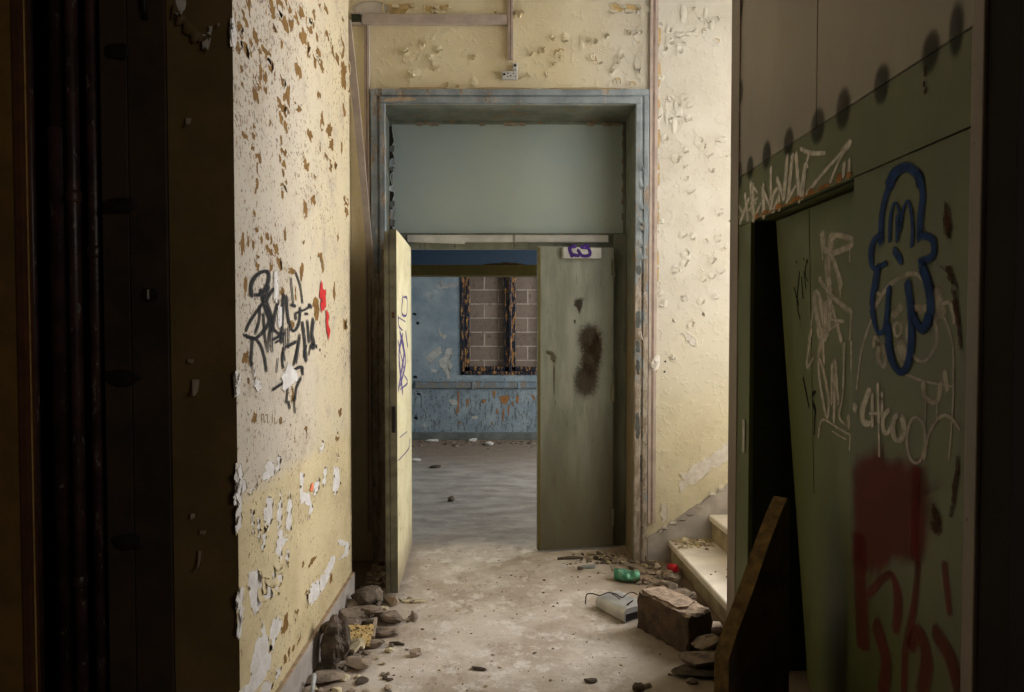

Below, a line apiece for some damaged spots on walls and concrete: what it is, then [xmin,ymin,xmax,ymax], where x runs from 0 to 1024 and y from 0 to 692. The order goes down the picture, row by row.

peeling [382,1,452,14]
peeling [528,2,722,89]
peeling [171,0,351,221]
peeling [377,37,478,229]
peeling [658,91,729,194]
peeling [239,120,304,333]
peeling [317,249,336,304]
peeling [657,207,729,347]
peeling [233,348,262,397]
spalling [278,360,298,426]
spalling [678,440,728,494]
spalling [233,406,350,692]